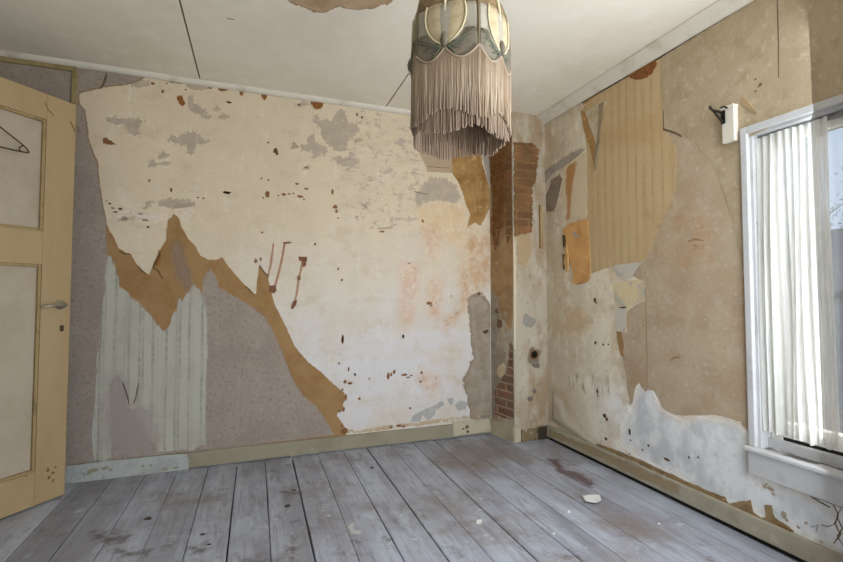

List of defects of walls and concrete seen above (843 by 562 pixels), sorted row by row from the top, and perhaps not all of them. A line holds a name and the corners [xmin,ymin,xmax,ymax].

leakage [289,0,392,13]
peeling [187,84,230,120]
peeling [167,130,209,156]
peeling [291,109,380,171]
peeling [143,197,195,210]
peeling [395,168,462,207]
corrosion [254,242,291,293]
corrosion [291,256,307,309]
flaking render [453,128,539,436]
peeling [613,261,645,332]
peeling [596,437,808,533]
crack [792,489,843,545]